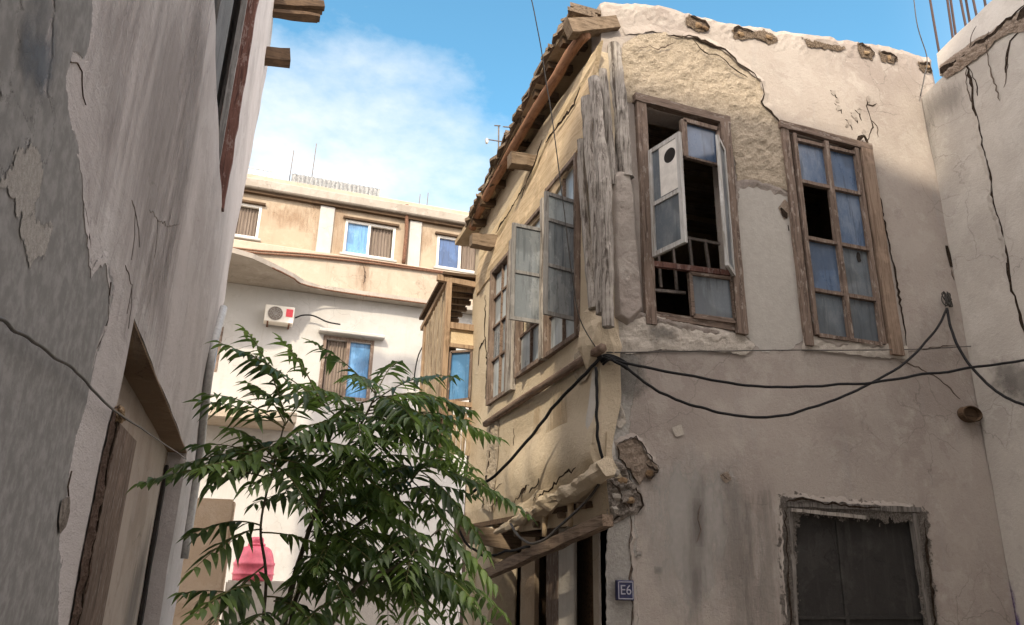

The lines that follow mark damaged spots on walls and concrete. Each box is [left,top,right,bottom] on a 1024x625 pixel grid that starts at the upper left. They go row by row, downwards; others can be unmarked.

crack [496,87,580,233]
flaking render [621,15,788,196]
spalling [802,37,898,64]
crack [857,101,878,143]
crack [965,27,1024,331]
peeling [0,0,114,625]
crack [97,201,180,348]
flaking render [631,312,720,335]
crack [879,192,960,399]
crack [491,467,576,507]
spalling [607,404,661,625]
spalling [774,491,939,625]